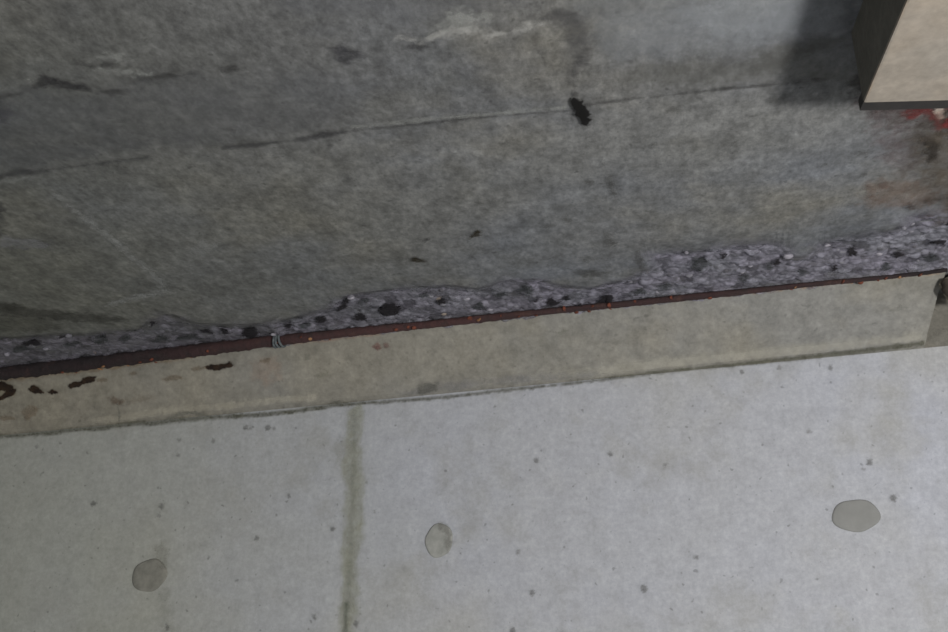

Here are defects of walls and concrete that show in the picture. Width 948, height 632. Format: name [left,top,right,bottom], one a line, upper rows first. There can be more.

crack [685,85,770,94]
crack [302,131,342,139]
spalling [0,215,948,367]
rust [206,350,233,370]
rust [60,365,105,389]
rust [0,381,16,400]
rust [28,385,58,394]